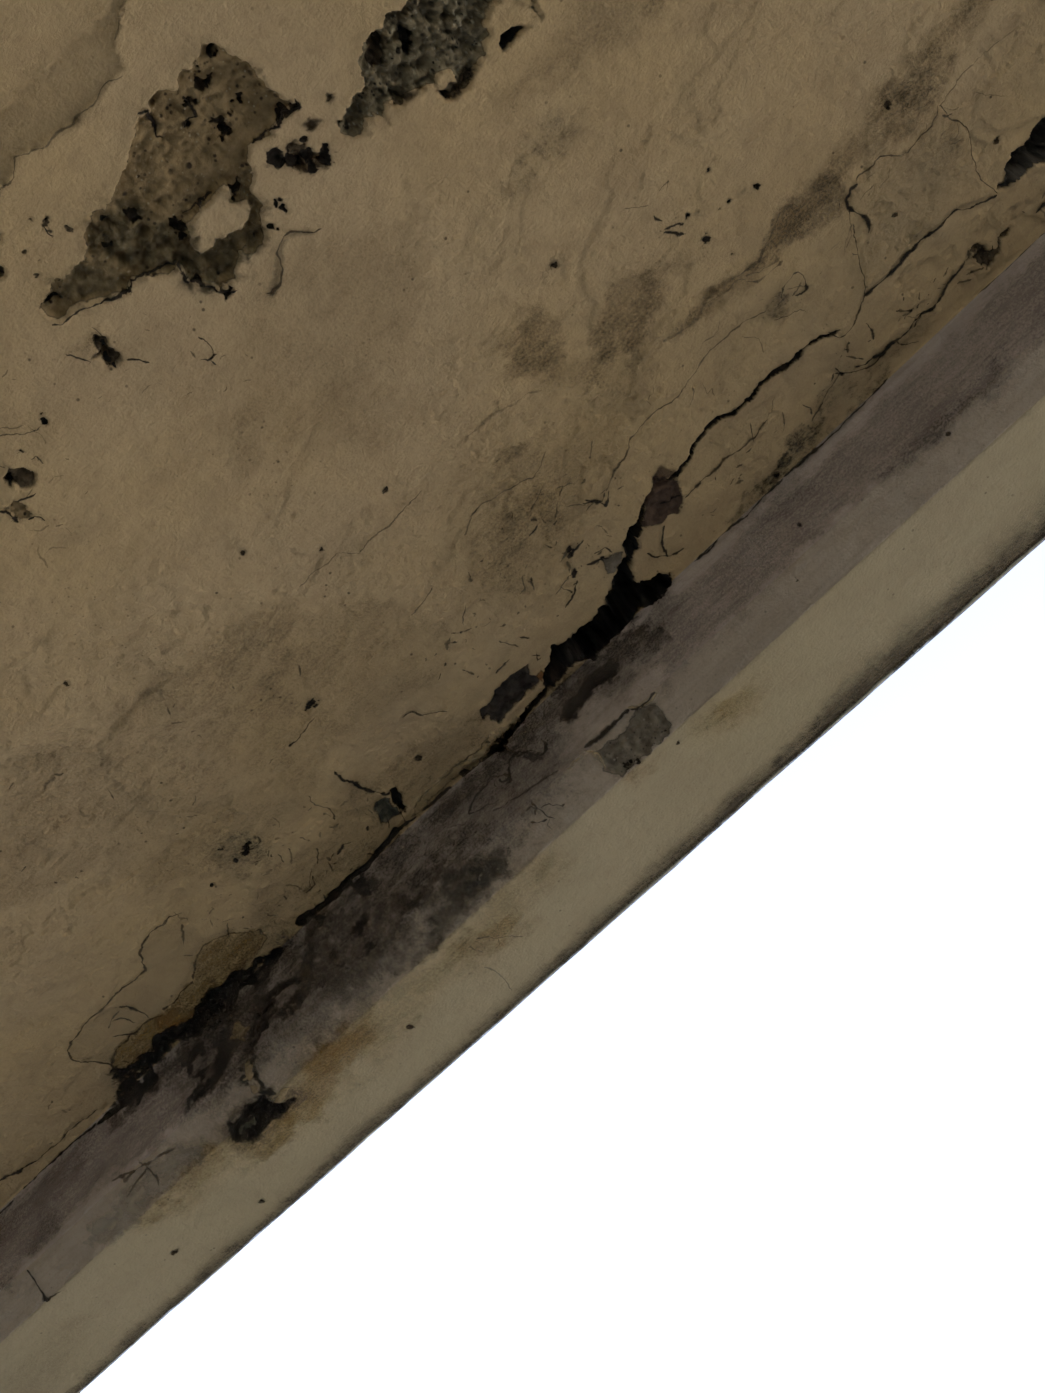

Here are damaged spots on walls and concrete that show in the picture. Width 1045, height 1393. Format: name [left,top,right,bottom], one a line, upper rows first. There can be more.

spalling [338,0,523,137]
spalling [22,43,335,326]
spalling [993,117,1045,187]
spalling [413,467,684,815]
crack [67,106,1045,1066]
water stain [0,253,1045,1283]
crack [0,1074,157,1214]
crack [112,1147,176,1196]
spalling [225,1087,304,1143]
crack [27,1270,61,1302]